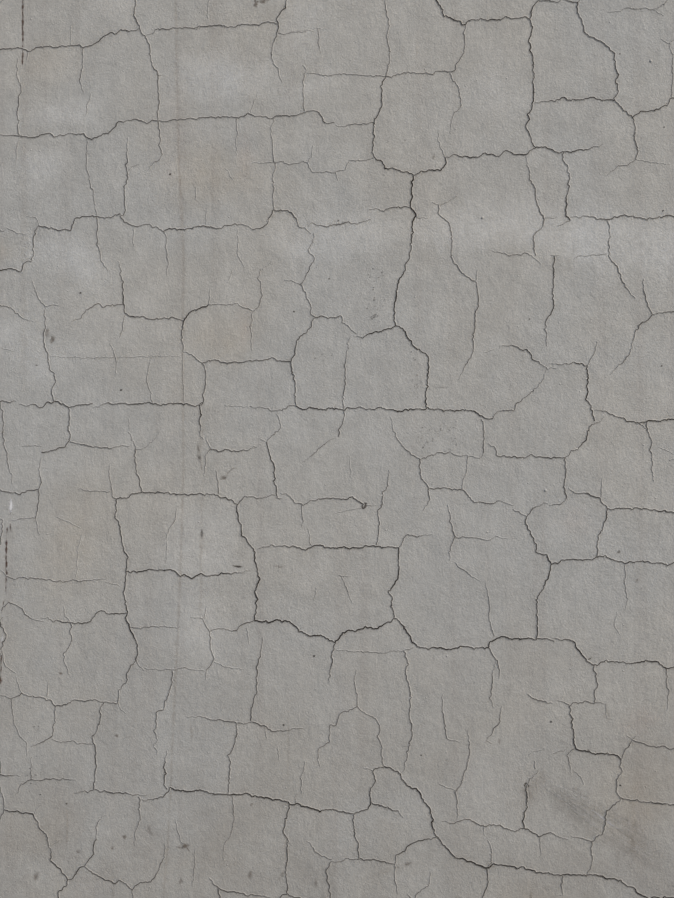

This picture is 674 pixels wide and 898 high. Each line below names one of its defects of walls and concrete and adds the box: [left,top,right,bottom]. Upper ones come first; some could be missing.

crack [0,0,674,299]
crack [0,400,17,485]
crack [19,280,130,454]
crack [67,175,556,500]
crack [543,254,559,346]
crack [487,341,674,506]
crack [610,279,674,375]
crack [0,417,674,898]